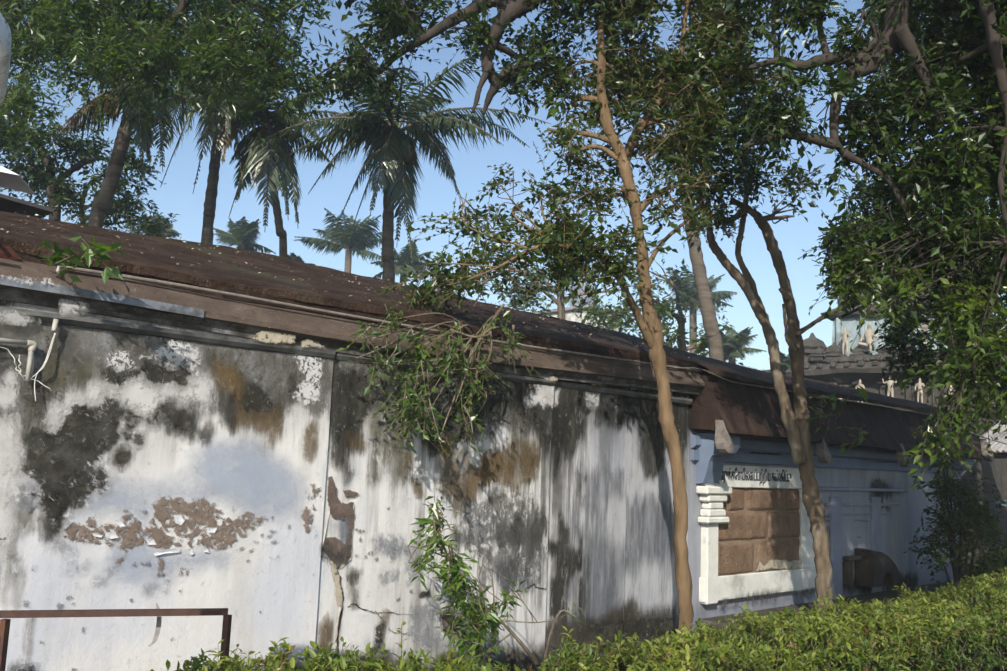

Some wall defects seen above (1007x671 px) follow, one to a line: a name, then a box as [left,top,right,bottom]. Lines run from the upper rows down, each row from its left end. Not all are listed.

peeling [66,494,276,581]
flaking render [288,476,359,606]
damp [0,300,678,671]
damp [671,393,691,456]